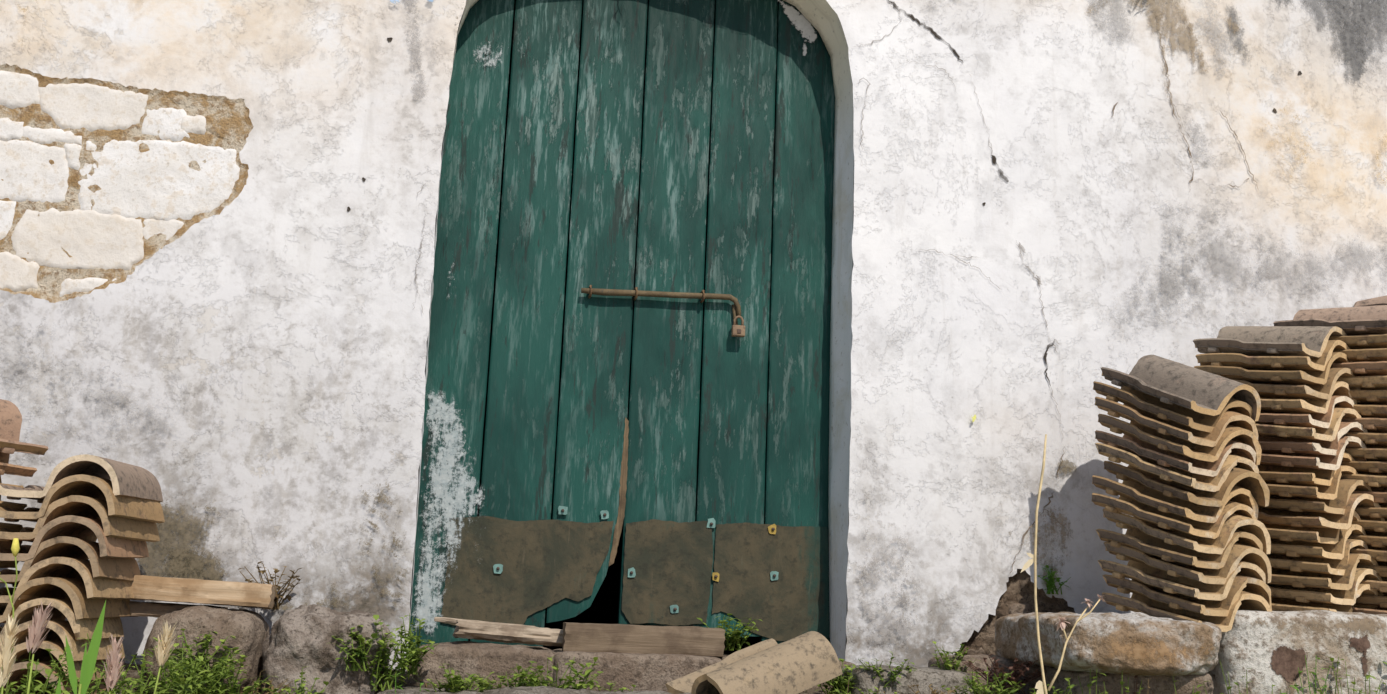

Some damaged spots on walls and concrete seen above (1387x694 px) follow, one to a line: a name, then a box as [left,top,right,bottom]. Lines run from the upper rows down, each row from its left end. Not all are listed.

spalling [0,63,253,303]
damp [405,0,426,100]
crack [854,0,1009,182]
crack [1158,31,1194,182]
crack [1221,112,1259,190]
damp [1279,0,1387,84]
crack [1010,243,1074,573]
spalling [954,569,1075,655]